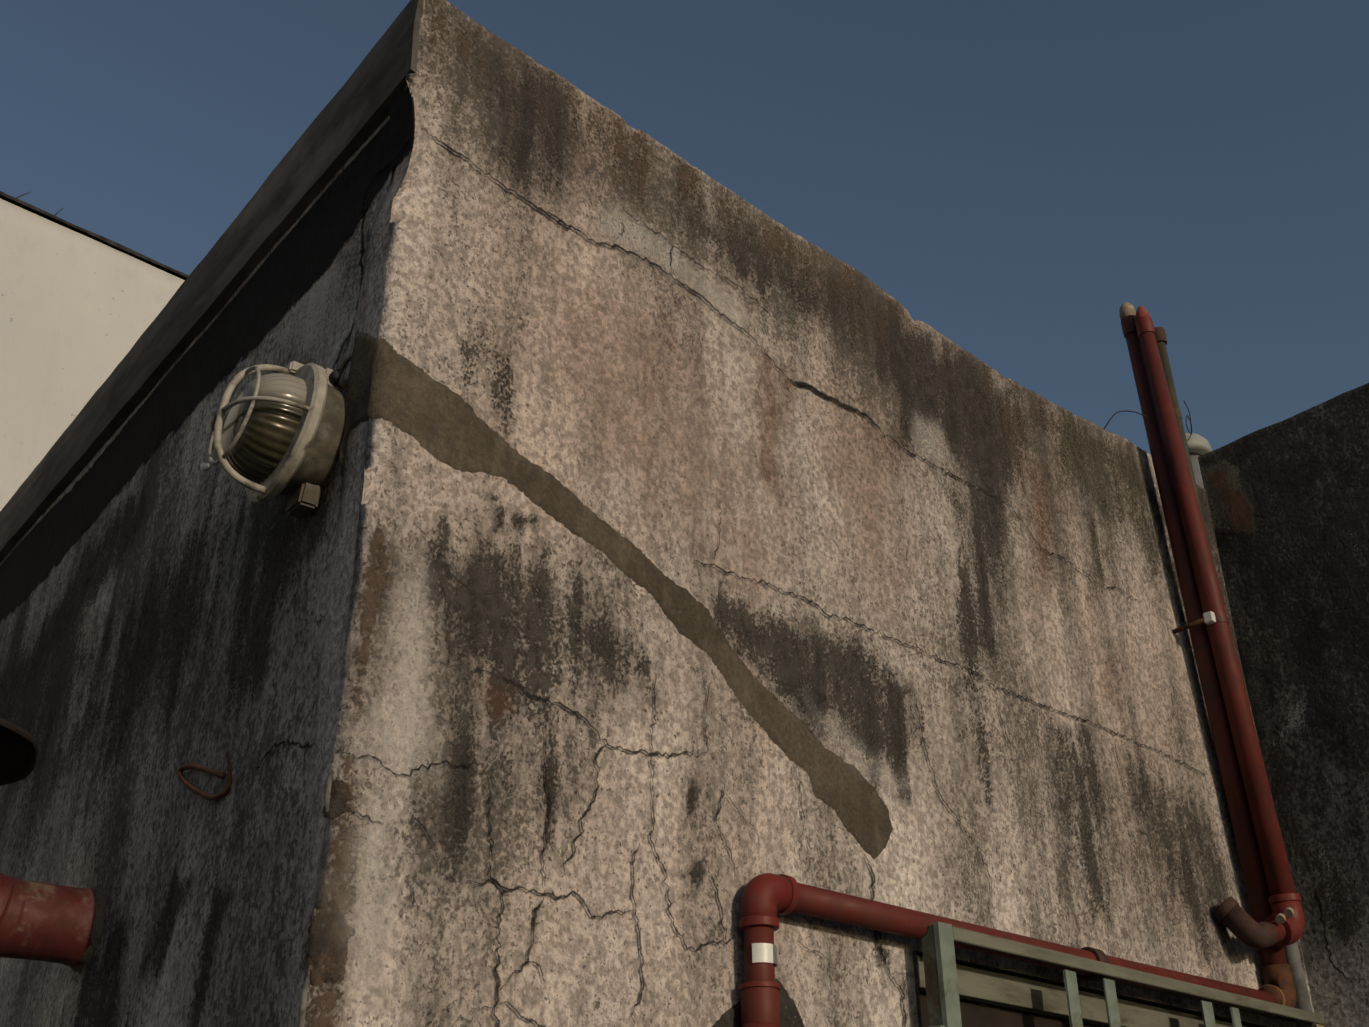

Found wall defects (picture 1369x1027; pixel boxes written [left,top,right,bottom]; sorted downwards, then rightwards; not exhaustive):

water stain [0,84,415,854]
crack [332,134,1137,600]
water stain [411,0,1219,816]
crack [254,740,314,774]
water stain [61,865,192,1027]
water stain [187,869,231,1027]
crack [346,668,745,1027]
water stain [691,860,707,889]
crack [865,855,914,1027]